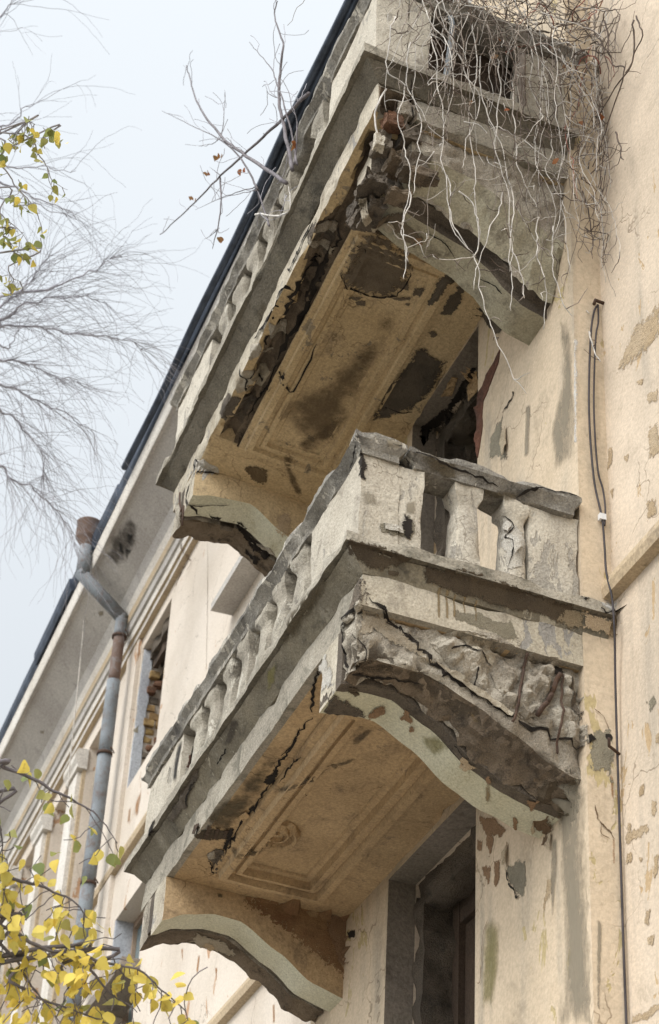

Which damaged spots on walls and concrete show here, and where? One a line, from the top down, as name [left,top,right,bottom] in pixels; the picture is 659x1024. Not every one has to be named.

spalling [219,198,464,423]
leakage [297,348,373,449]
spalling [373,331,508,460]
leakage [553,335,578,462]
leakage [244,466,268,485]
crack [393,443,577,498]
leakage [109,522,135,562]
crack [174,486,227,600]
peeling [310,654,386,720]
spalling [340,539,615,783]
crack [225,717,313,855]
peeling [477,816,526,899]